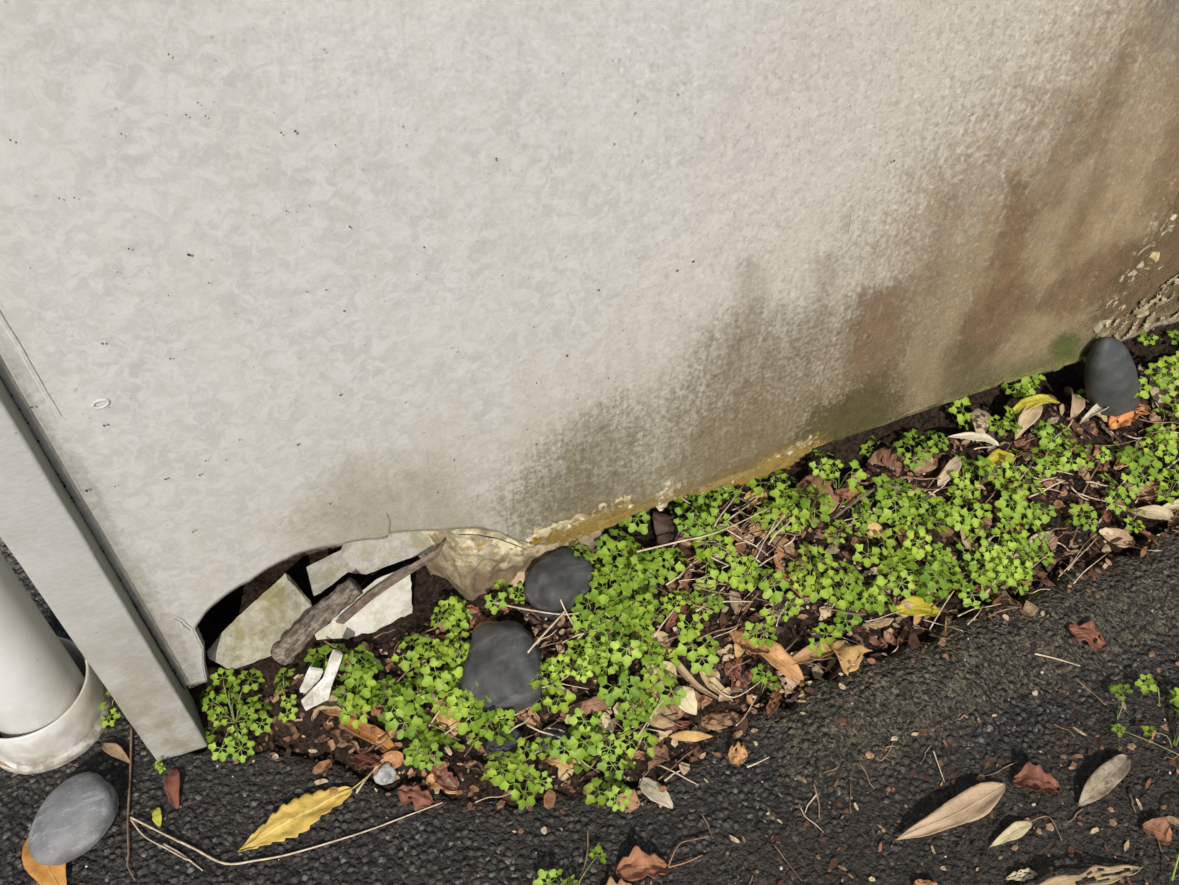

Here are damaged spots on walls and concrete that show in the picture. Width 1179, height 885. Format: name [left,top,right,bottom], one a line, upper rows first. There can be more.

peeling [1093,178,1179,339]
leakage [528,327,994,526]
spalling [299,649,343,711]